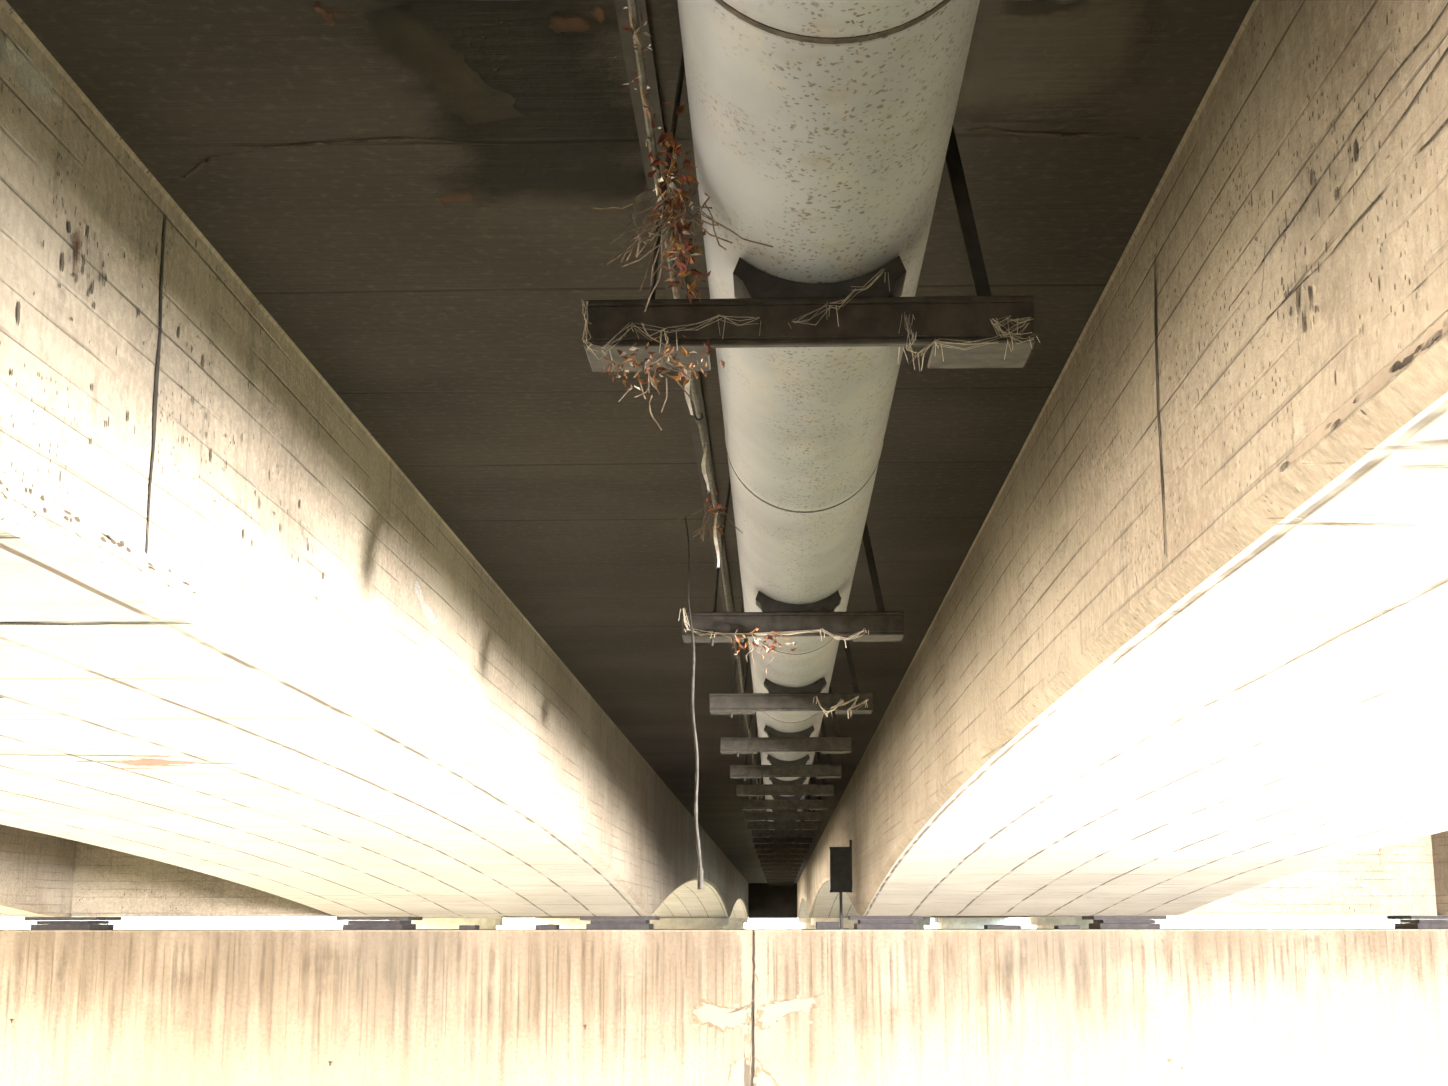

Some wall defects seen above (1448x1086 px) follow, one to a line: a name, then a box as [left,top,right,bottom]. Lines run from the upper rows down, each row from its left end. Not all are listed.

damp [380,0,646,196]
crack [144,215,167,555]
crack [1154,262,1165,555]
peeling [692,993,824,1086]